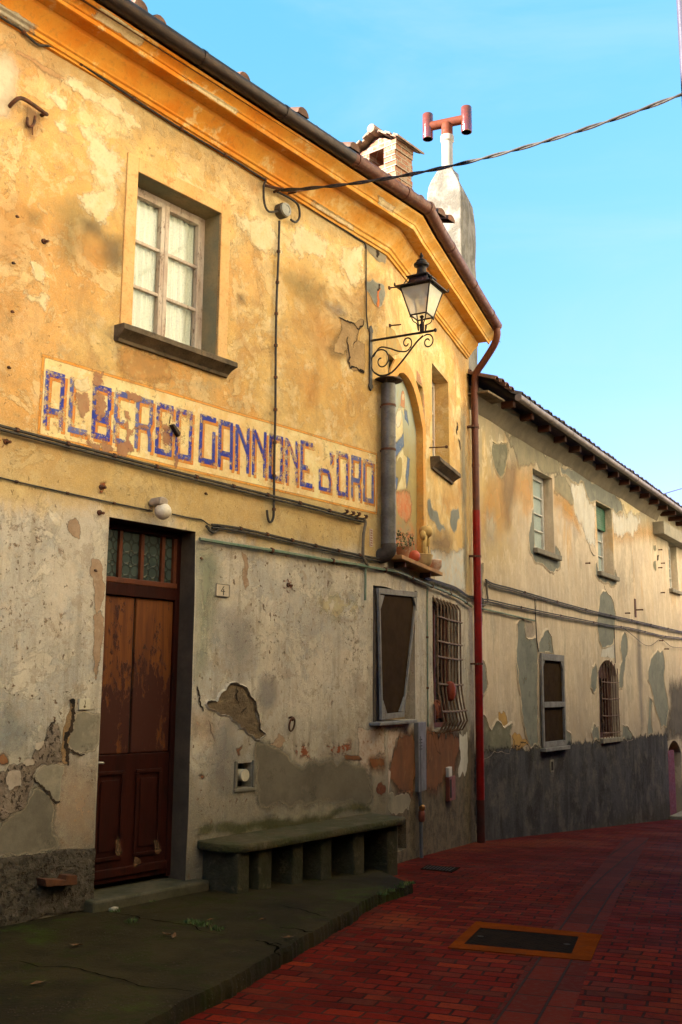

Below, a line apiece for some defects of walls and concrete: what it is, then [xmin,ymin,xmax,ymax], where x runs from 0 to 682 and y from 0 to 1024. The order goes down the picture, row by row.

spalling [330,317,365,374]
peeling [74,371,107,422]
peeling [86,391,149,457]
peeling [67,518,80,539]
peeling [613,498,640,538]
peeling [90,559,105,679]
crack [49,698,85,766]
spalling [204,681,286,748]
spalling [0,724,62,822]
crack [34,777,60,803]